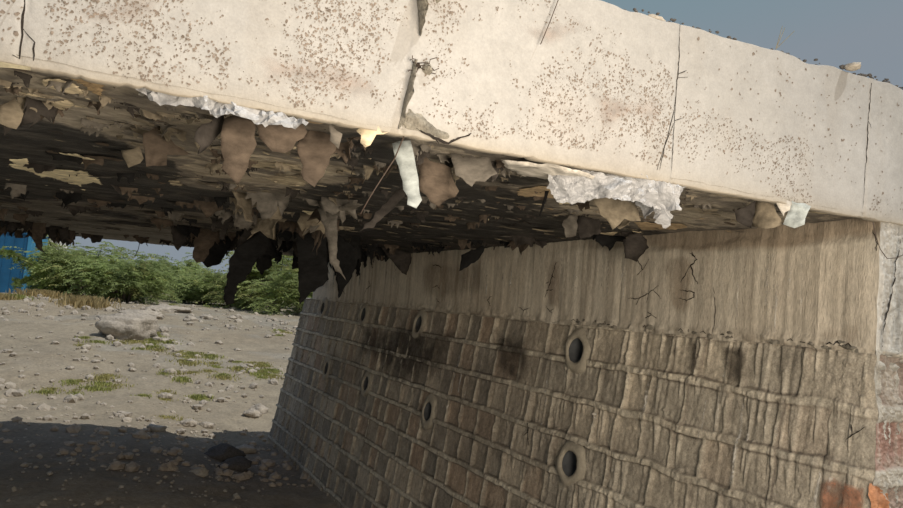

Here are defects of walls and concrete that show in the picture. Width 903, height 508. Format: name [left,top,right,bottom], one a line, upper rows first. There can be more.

crack [628,253,716,333]
crack [873,233,901,347]
damp [362,331,443,373]
spalling [766,338,859,353]